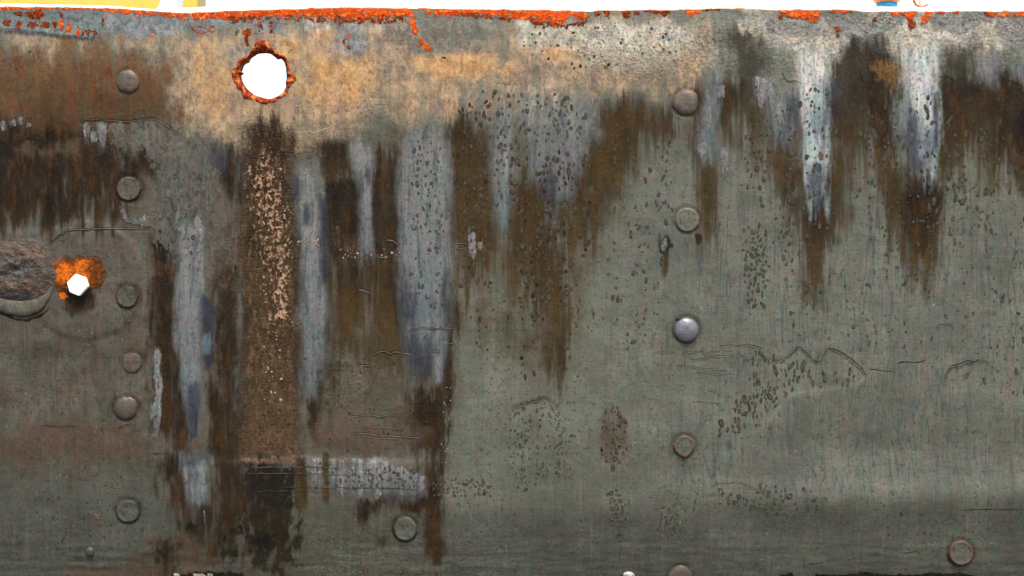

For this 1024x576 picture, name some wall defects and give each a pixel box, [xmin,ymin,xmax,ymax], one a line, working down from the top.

corrosion [0,7,671,52]
corrosion [777,9,853,22]
corrosion [891,10,959,30]
water stain [693,28,1024,307]
corrosion [53,255,106,317]
corrosion [216,114,305,480]
water stain [0,92,673,576]